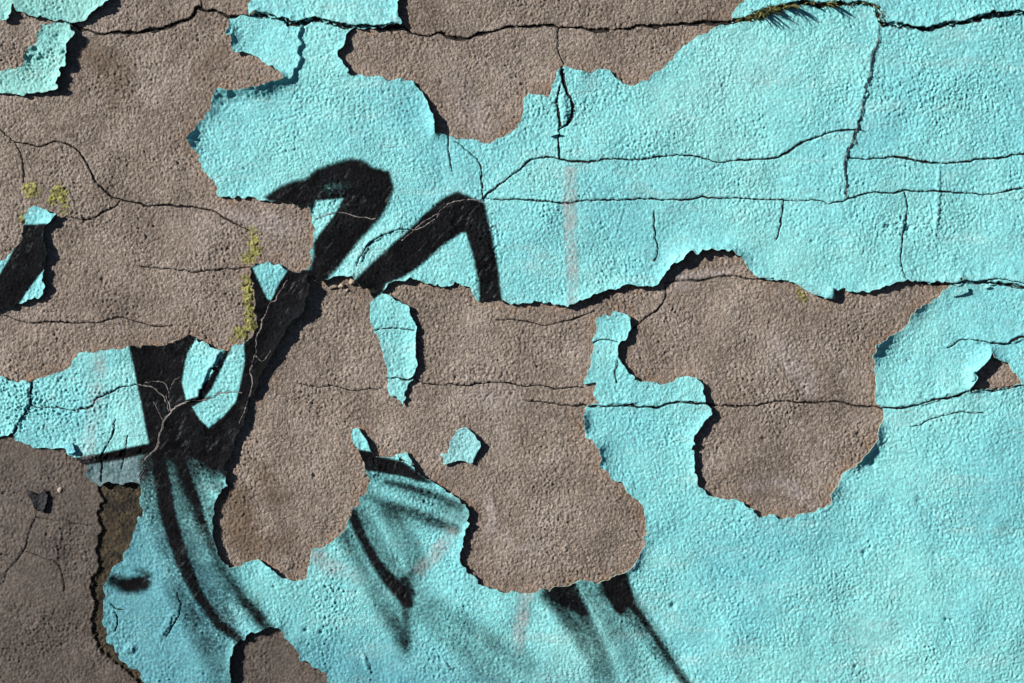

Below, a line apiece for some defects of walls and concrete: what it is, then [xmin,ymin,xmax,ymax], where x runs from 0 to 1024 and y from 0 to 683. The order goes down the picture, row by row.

peeling [338,0,744,144]
crack [0,129,250,231]
peeling [0,0,315,383]
crack [66,0,1024,427]
crack [0,280,288,482]
peeling [212,248,949,593]
peeling [964,354,1024,390]
peeling [0,434,138,683]
peeling [229,627,325,683]